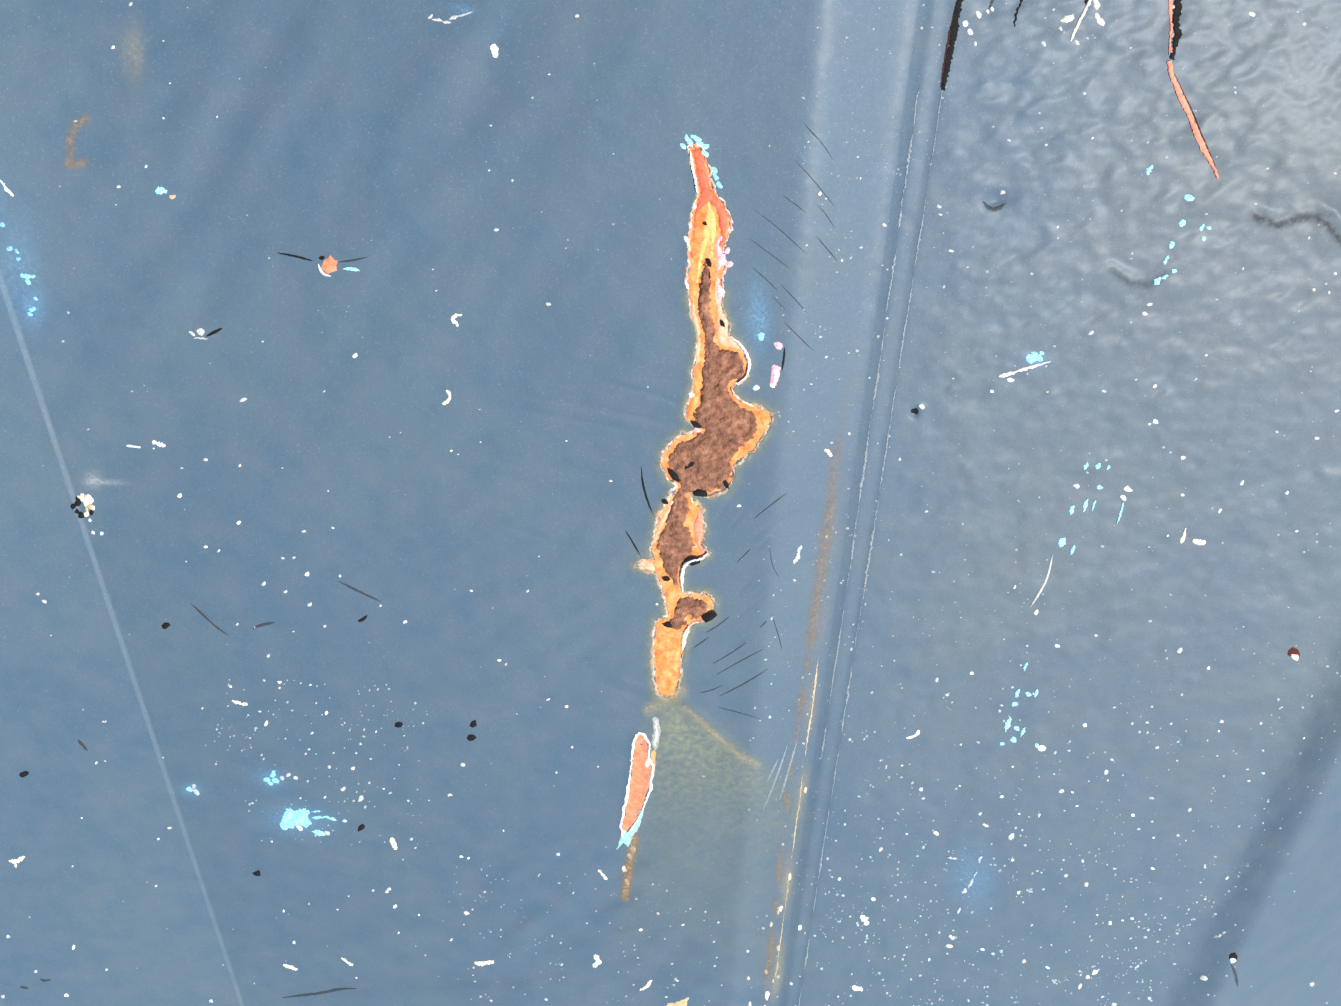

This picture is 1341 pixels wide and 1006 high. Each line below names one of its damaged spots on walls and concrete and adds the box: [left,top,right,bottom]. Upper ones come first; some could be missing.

peeling [625,134,785,702]
spalling [617,717,661,899]